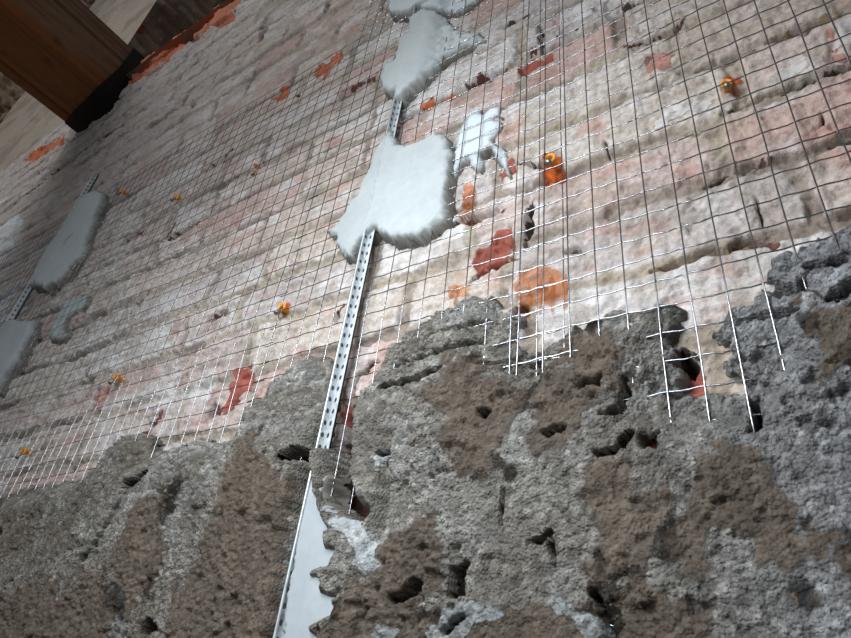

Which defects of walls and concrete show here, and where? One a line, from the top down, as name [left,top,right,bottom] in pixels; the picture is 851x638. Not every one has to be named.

spalling [129,0,240,85]
spalling [472,227,516,280]
spalling [217,363,255,415]